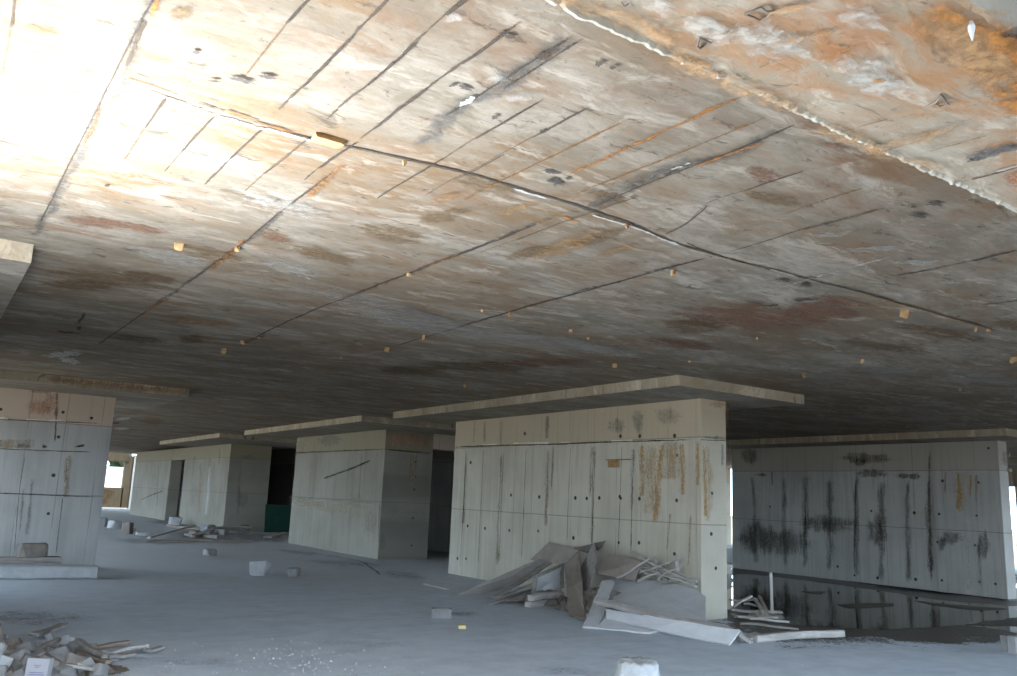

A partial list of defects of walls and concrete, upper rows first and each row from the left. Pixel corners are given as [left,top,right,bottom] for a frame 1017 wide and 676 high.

crack [0,0,389,235]
crack [327,0,468,119]
crack [246,25,1017,345]
rust [570,6,794,175]
rust [826,120,947,155]
rust [911,7,1017,115]
leakage [740,454,887,568]